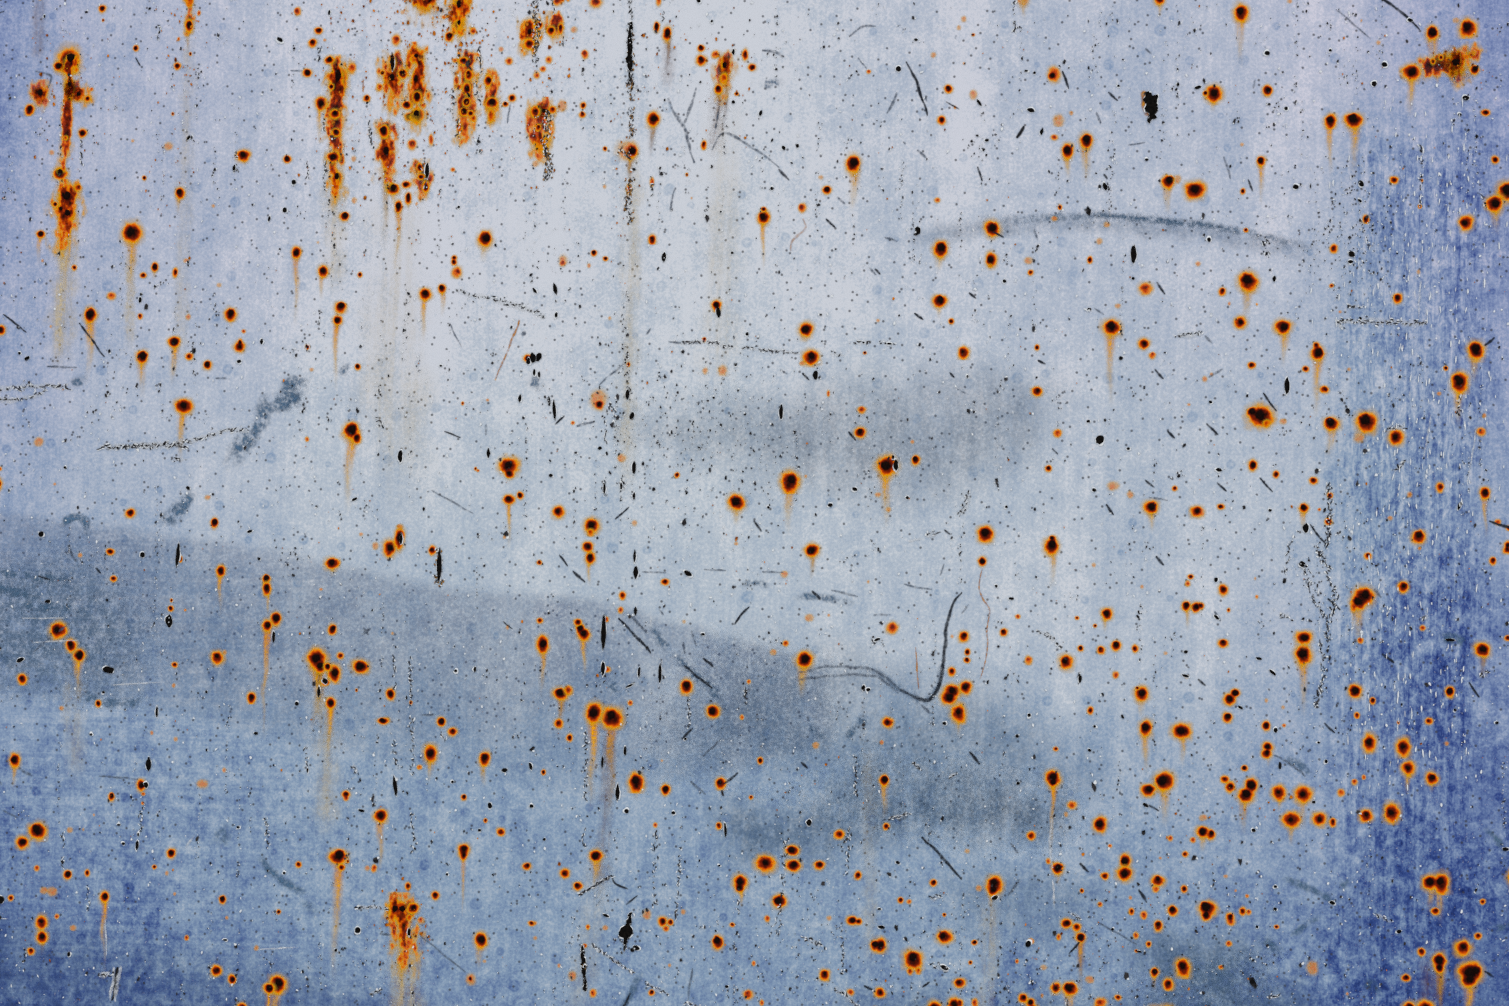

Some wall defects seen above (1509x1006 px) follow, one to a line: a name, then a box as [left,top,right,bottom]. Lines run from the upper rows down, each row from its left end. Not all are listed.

corrosion [696,44,756,106]
corrosion [1400,18,1483,92]
corrosion [294,0,588,229]
corrosion [25,47,93,271]
corrosion [121,222,188,278]
corrosion [1246,403,1286,428]
corrosion [1350,587,1375,643]
corrosion [307,624,369,732]
corrosion [553,685,633,763]
corrosion [1140,771,1174,801]
corrosion [384,882,440,969]
corrosion [1403,933,1483,1006]